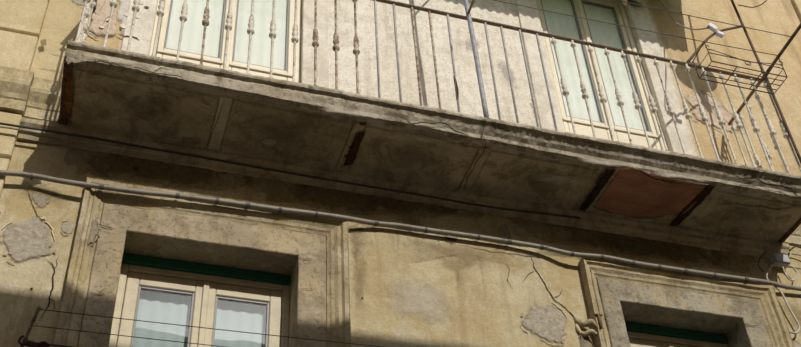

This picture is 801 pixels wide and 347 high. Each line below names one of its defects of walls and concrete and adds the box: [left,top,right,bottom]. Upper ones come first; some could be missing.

peeling [88,0,149,39]
spalling [66,51,86,64]
crack [394,113,592,192]
flaking render [585,158,712,219]
crack [737,176,800,197]
peeling [0,190,75,266]
crack [39,257,58,321]
crack [506,253,573,316]
spalling [578,334,594,347]